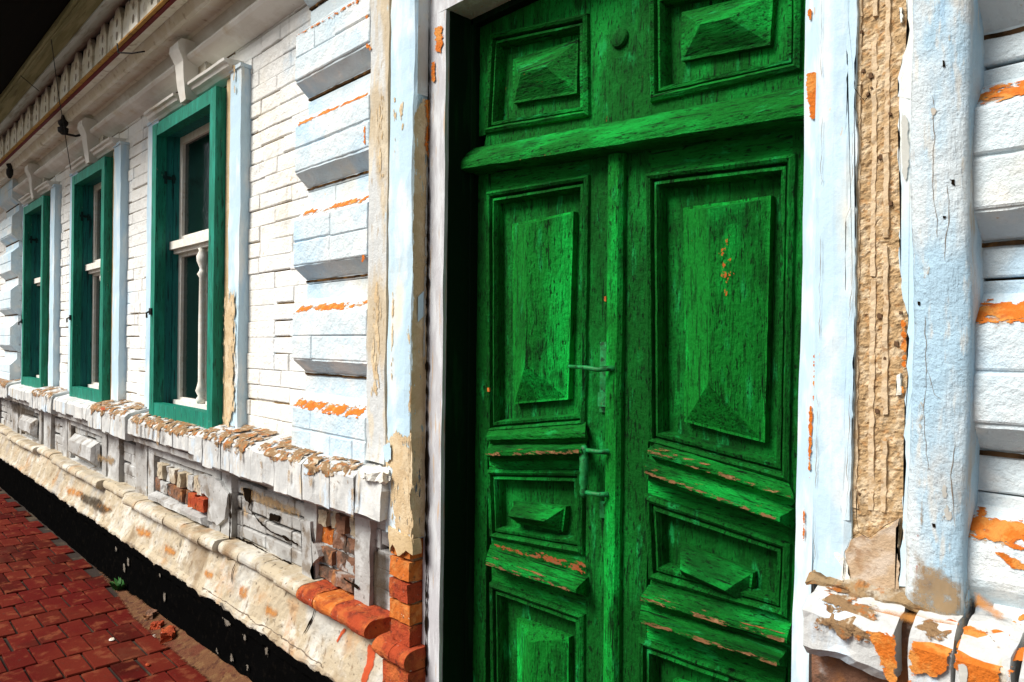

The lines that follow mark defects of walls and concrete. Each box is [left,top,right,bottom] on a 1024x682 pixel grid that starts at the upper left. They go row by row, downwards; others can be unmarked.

peeling [806,72,816,119]
peeling [977,80,1024,105]
flaking render [90,0,430,682]
flaking render [841,0,923,587]
peeling [976,299,1024,324]
peeling [969,507,1024,570]
spalling [814,586,1024,682]